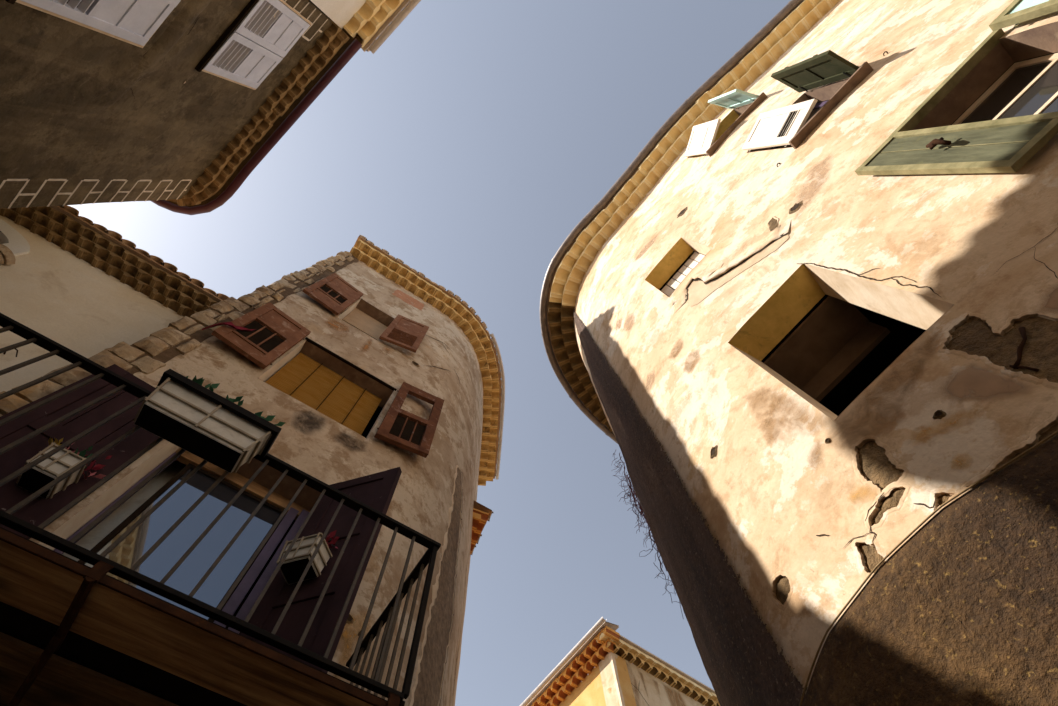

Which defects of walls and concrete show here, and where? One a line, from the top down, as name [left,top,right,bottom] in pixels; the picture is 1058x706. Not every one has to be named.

crack [797,263,939,296]
crack [994,227,1058,279]
spalling [937,310,1058,391]
spalling [929,409,1058,516]
spalling [851,435,910,578]
spalling [770,571,794,611]